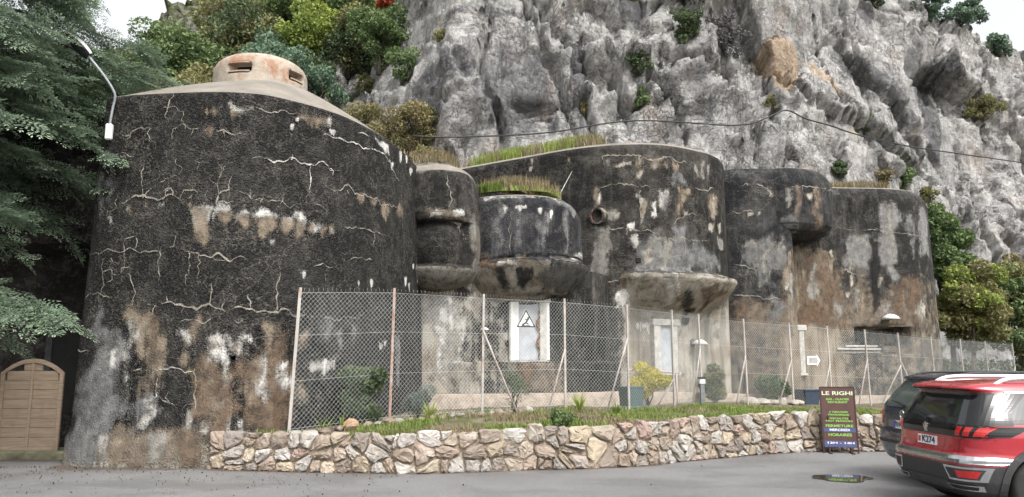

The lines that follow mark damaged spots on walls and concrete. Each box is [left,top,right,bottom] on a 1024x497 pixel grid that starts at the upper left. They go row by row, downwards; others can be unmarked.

water stain [66,304,210,469]
crack [134,367,197,414]
water stain [208,332,242,356]
crack [86,236,377,328]
crack [110,92,404,281]
water stain [188,203,332,246]
water stain [627,171,721,314]
water stain [841,190,930,332]